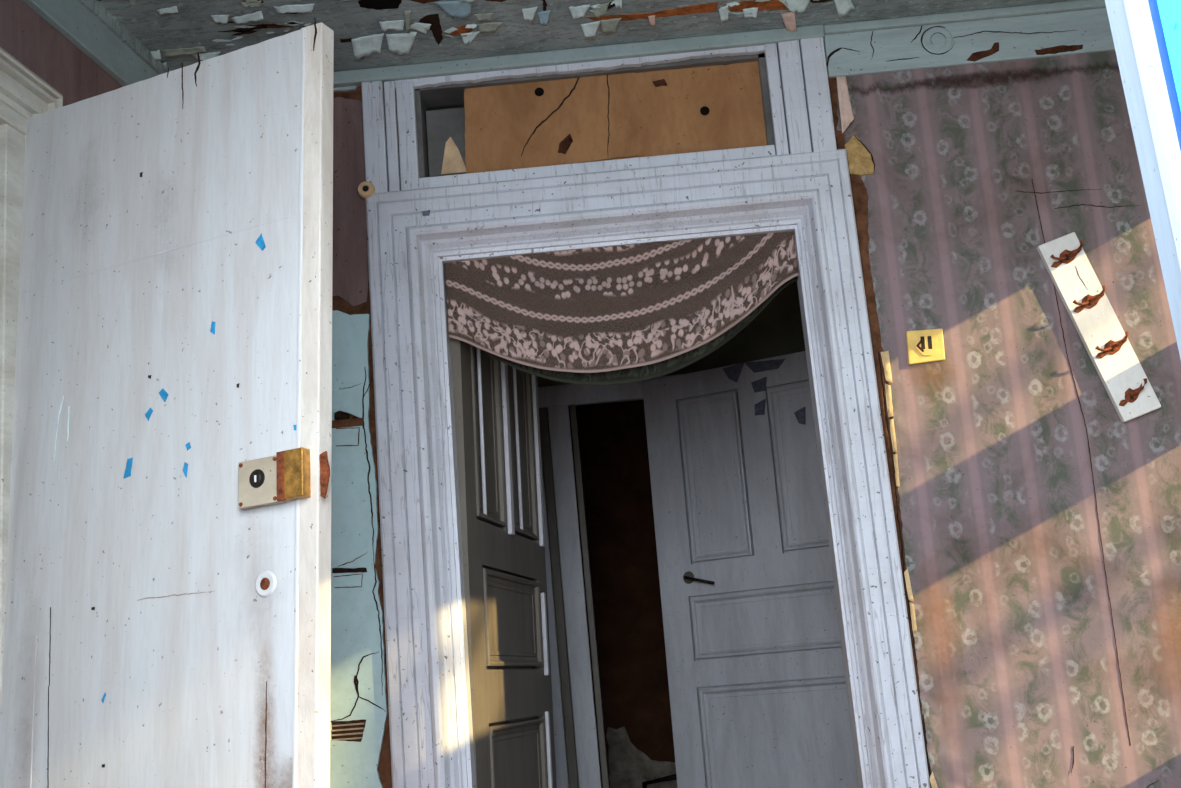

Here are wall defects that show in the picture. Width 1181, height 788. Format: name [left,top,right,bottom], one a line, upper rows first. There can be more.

peeling [151,0,314,66]
peeling [340,0,506,60]
peeling [522,0,551,26]
peeling [569,0,855,38]
peeling [966,42,999,62]
peeling [1035,45,1083,55]
crack [521,75,610,156]
crack [1018,179,1140,243]
flaking render [319,411,363,499]
crack [1053,266,1131,746]
flaking render [332,553,367,588]
crack [331,369,386,722]